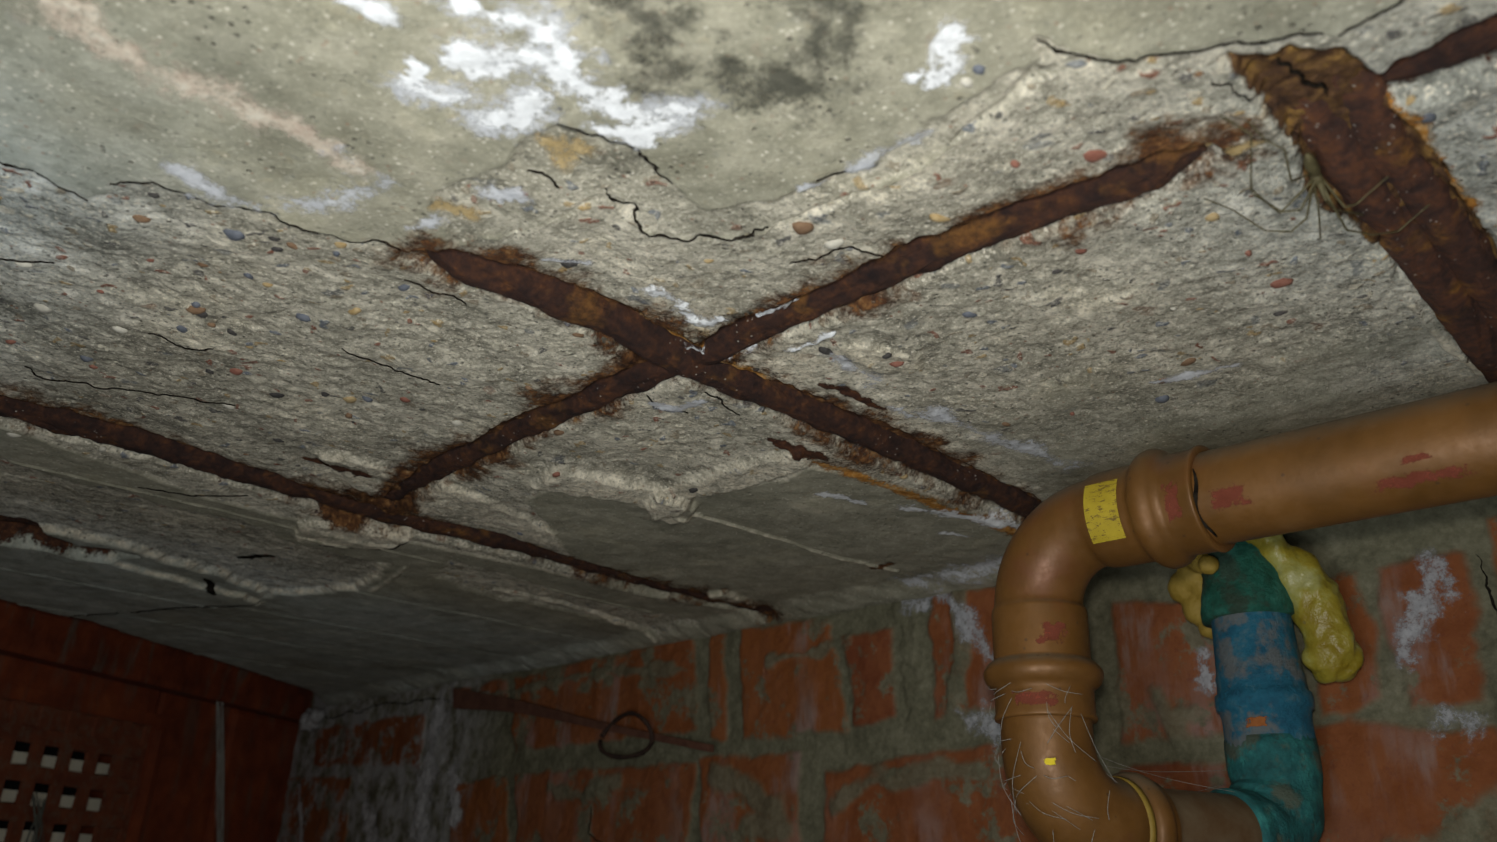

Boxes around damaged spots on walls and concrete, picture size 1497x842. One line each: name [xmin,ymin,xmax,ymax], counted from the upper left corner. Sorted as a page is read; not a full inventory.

crack [0,162,466,304]
crack [557,124,673,185]
damp [386,0,864,168]
crack [605,188,769,243]
corrosion [376,44,1497,348]
efflorescence [903,22,974,91]
crack [1036,0,1404,102]
spalling [0,0,1497,618]
corrosion [0,520,116,557]
corrosion [0,329,648,538]
corrosion [721,335,1042,503]
corrosion [766,413,1025,535]